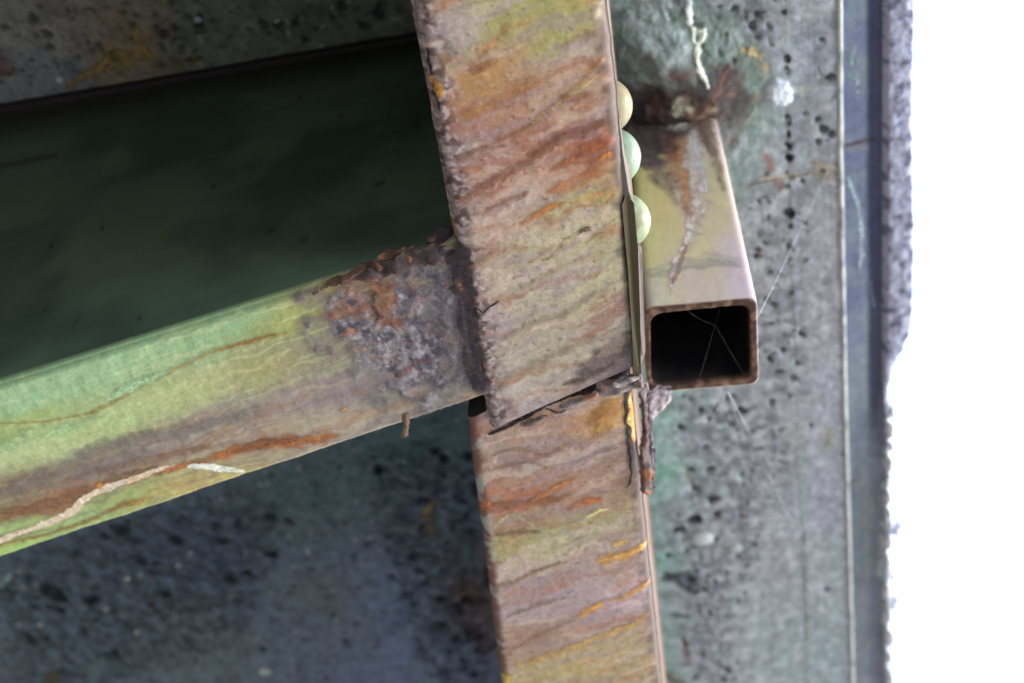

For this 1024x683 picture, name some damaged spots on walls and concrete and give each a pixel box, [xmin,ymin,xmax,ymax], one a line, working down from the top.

corrosion [457,58,604,159]
corrosion [458,120,611,226]
corrosion [626,66,730,290]
corrosion [529,219,616,270]
corrosion [312,225,492,394]
corrosion [559,329,672,495]
corrosion [0,497,148,546]
corrosion [0,415,338,521]
corrosion [498,562,563,587]
corrosion [479,478,608,536]
corrosion [507,581,649,654]
corrosion [598,539,646,566]